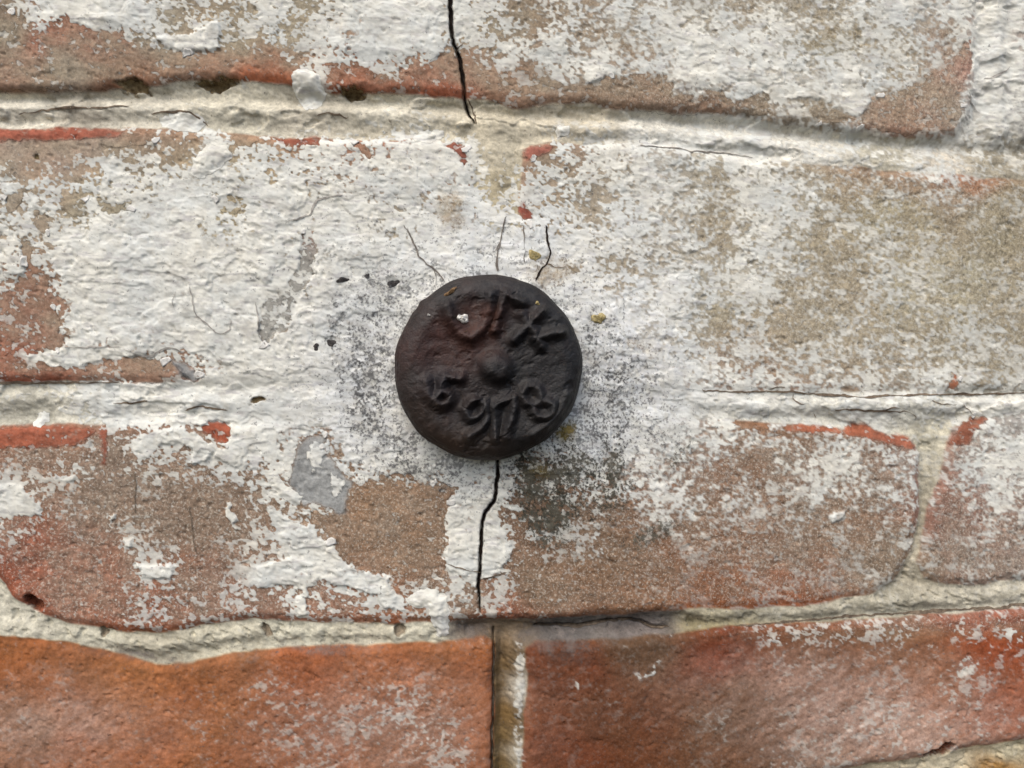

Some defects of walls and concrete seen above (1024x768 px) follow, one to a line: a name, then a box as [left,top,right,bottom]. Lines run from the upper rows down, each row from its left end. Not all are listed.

peeling [0,112,206,148]
peeling [0,5,299,98]
crack [448,0,477,124]
peeling [325,52,769,116]
peeling [810,40,972,136]
peeling [0,210,205,383]
peeling [259,229,317,349]
peeling [0,424,108,464]
peeling [202,421,230,449]
peeling [785,423,915,450]
peeling [269,431,456,578]
crack [448,460,506,768]